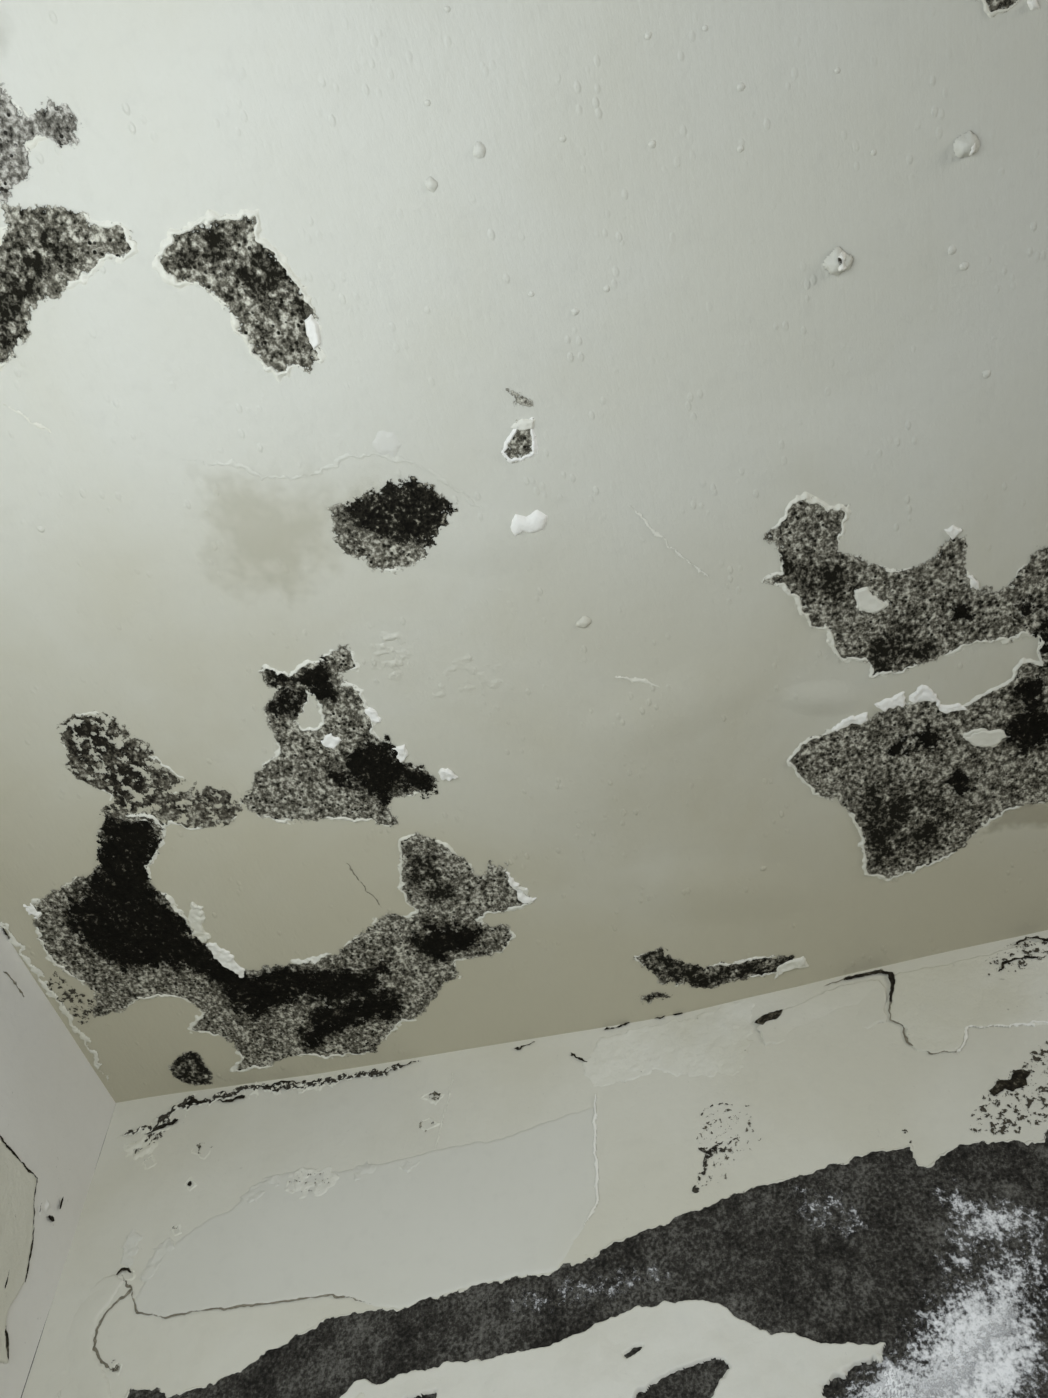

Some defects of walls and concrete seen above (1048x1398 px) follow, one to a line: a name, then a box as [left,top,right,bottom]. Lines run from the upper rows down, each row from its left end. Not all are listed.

peeling [975,0,1040,18]
peeling [0,82,327,382]
peeling [327,476,458,575]
peeling [761,491,1048,882]
peeling [23,644,537,1072]
peeling [633,947,809,1005]
peeling [755,936,1048,1055]
spalling [116,1091,1048,1398]